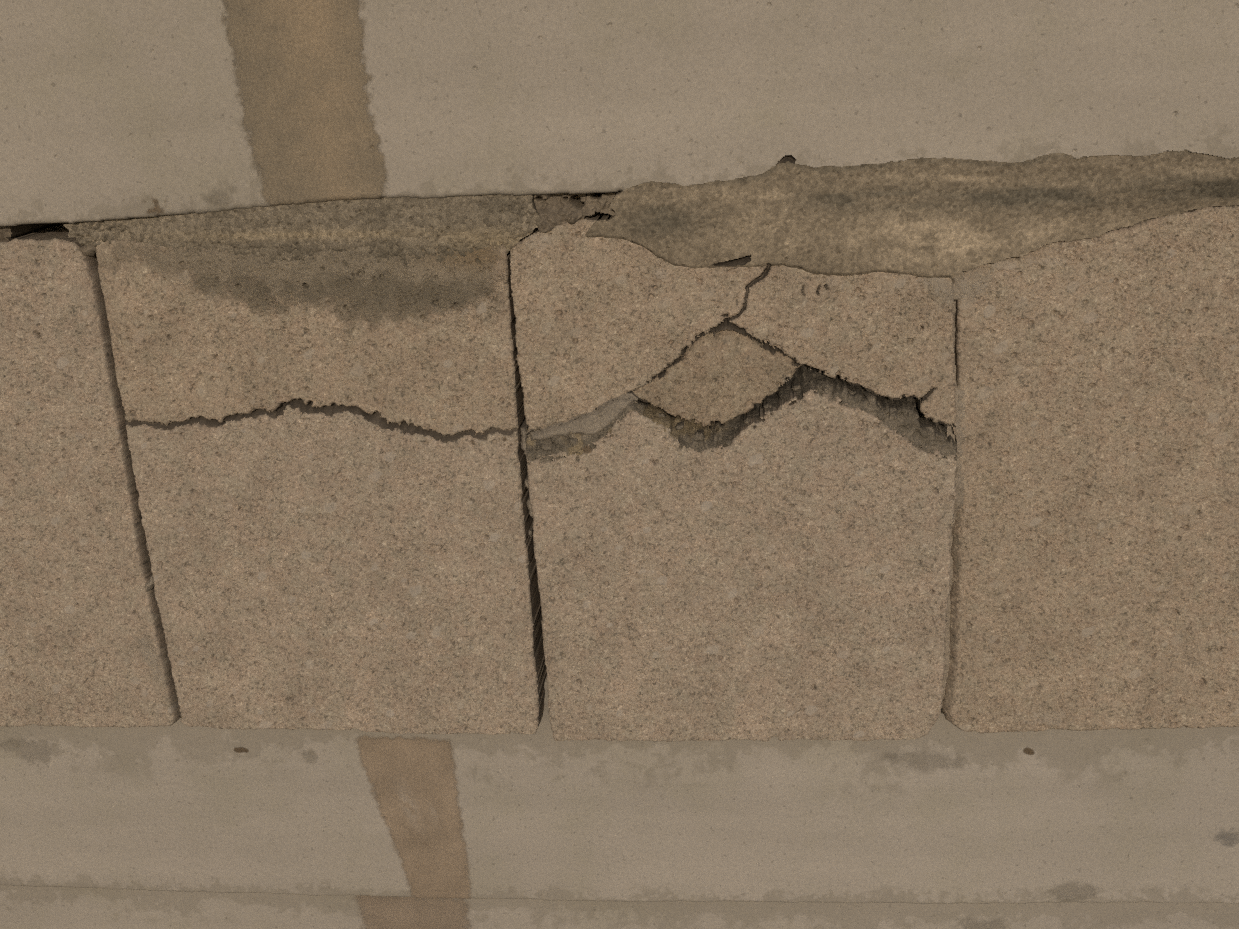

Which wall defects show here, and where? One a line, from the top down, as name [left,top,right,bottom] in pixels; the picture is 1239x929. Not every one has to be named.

spalling [776,155,796,165]
peeling [714,254,751,266]
leakage [134,245,502,322]
crack [631,263,804,392]
crack [125,398,518,443]
spalling [524,364,957,465]
crack [920,388,937,403]